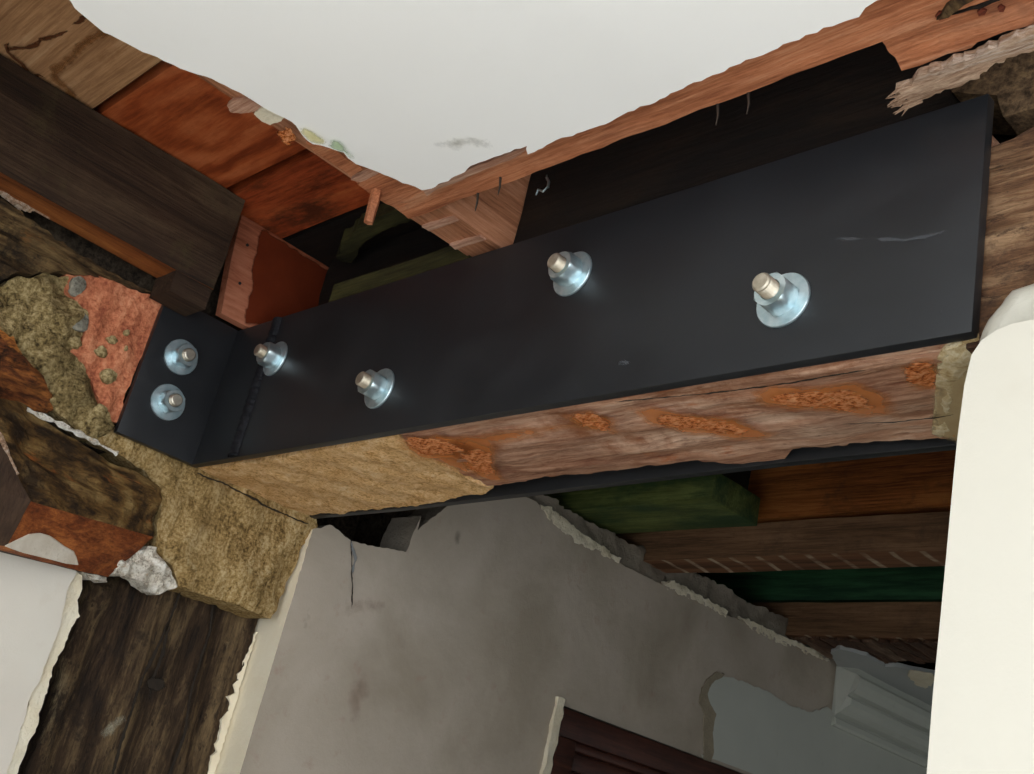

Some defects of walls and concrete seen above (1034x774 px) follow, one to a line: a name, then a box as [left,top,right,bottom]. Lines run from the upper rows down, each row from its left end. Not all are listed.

flaking render [61,274,162,424]
peeling [771,390,875,412]
peeling [406,437,495,476]
crack [350,539,358,605]
flaking render [528,495,830,661]
peeling [908,670,935,689]